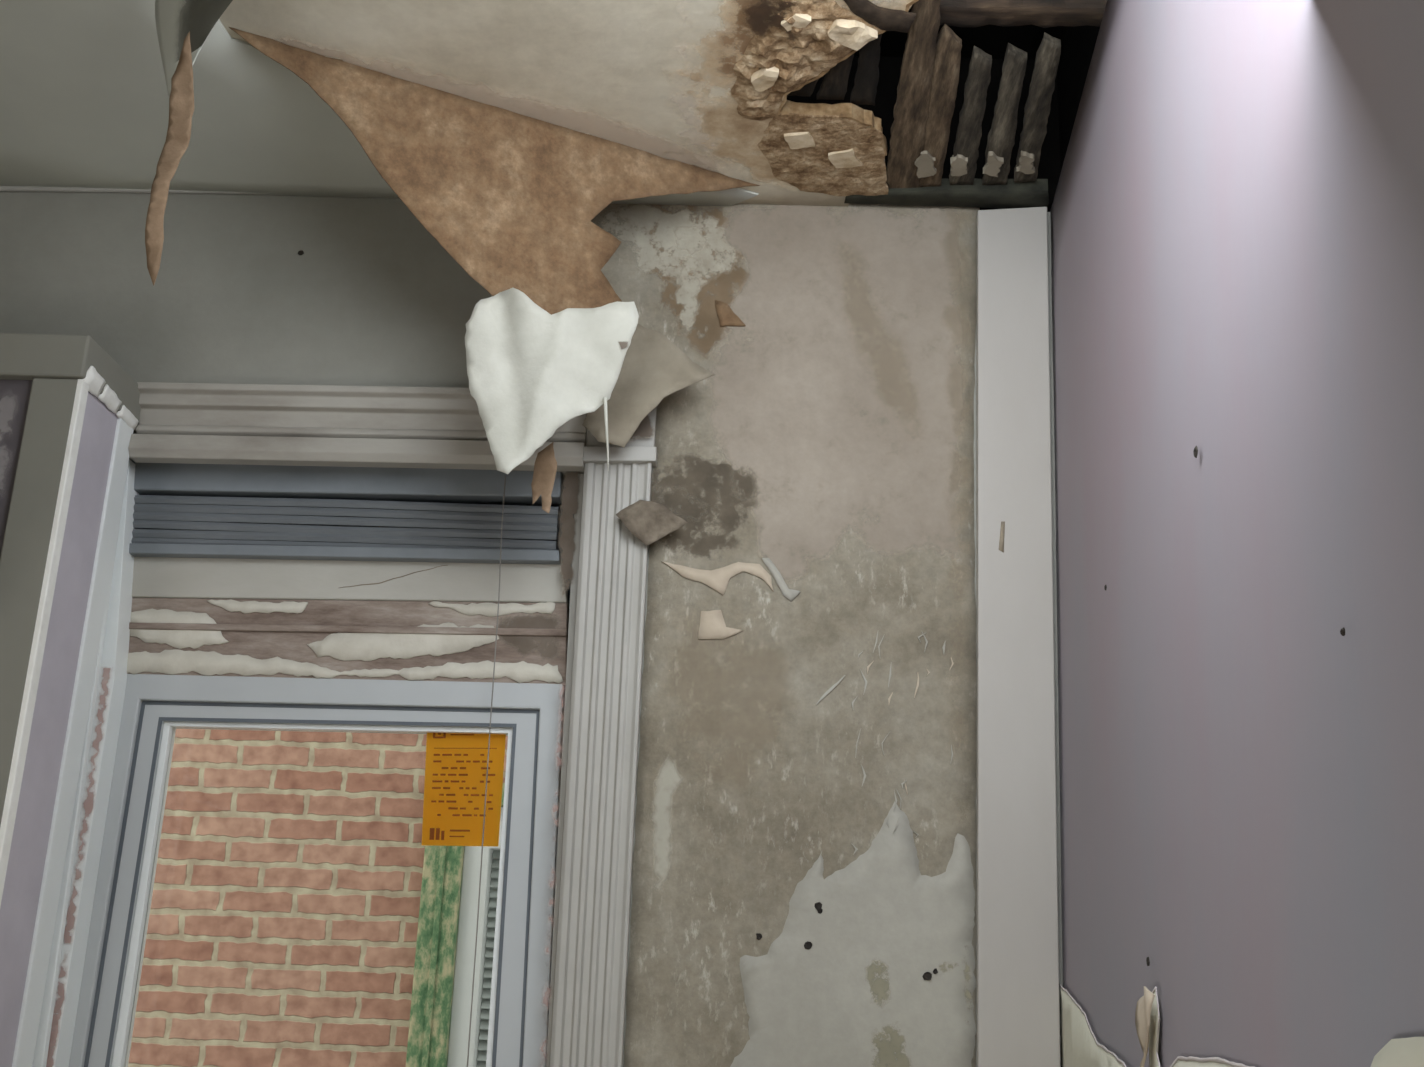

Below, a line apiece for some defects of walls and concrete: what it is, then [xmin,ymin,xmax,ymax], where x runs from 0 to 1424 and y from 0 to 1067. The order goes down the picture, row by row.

crack [844,0,916,33]
damp [869,0,913,11]
damp [289,0,790,185]
peeling [602,0,963,640]
peeling [0,395,16,492]
peeling [127,599,564,720]
peeling [64,668,110,943]
peeling [730,801,976,1067]
peeling [46,967,65,1067]
peeling [1059,984,1255,1067]
peeling [1370,1037,1424,1067]